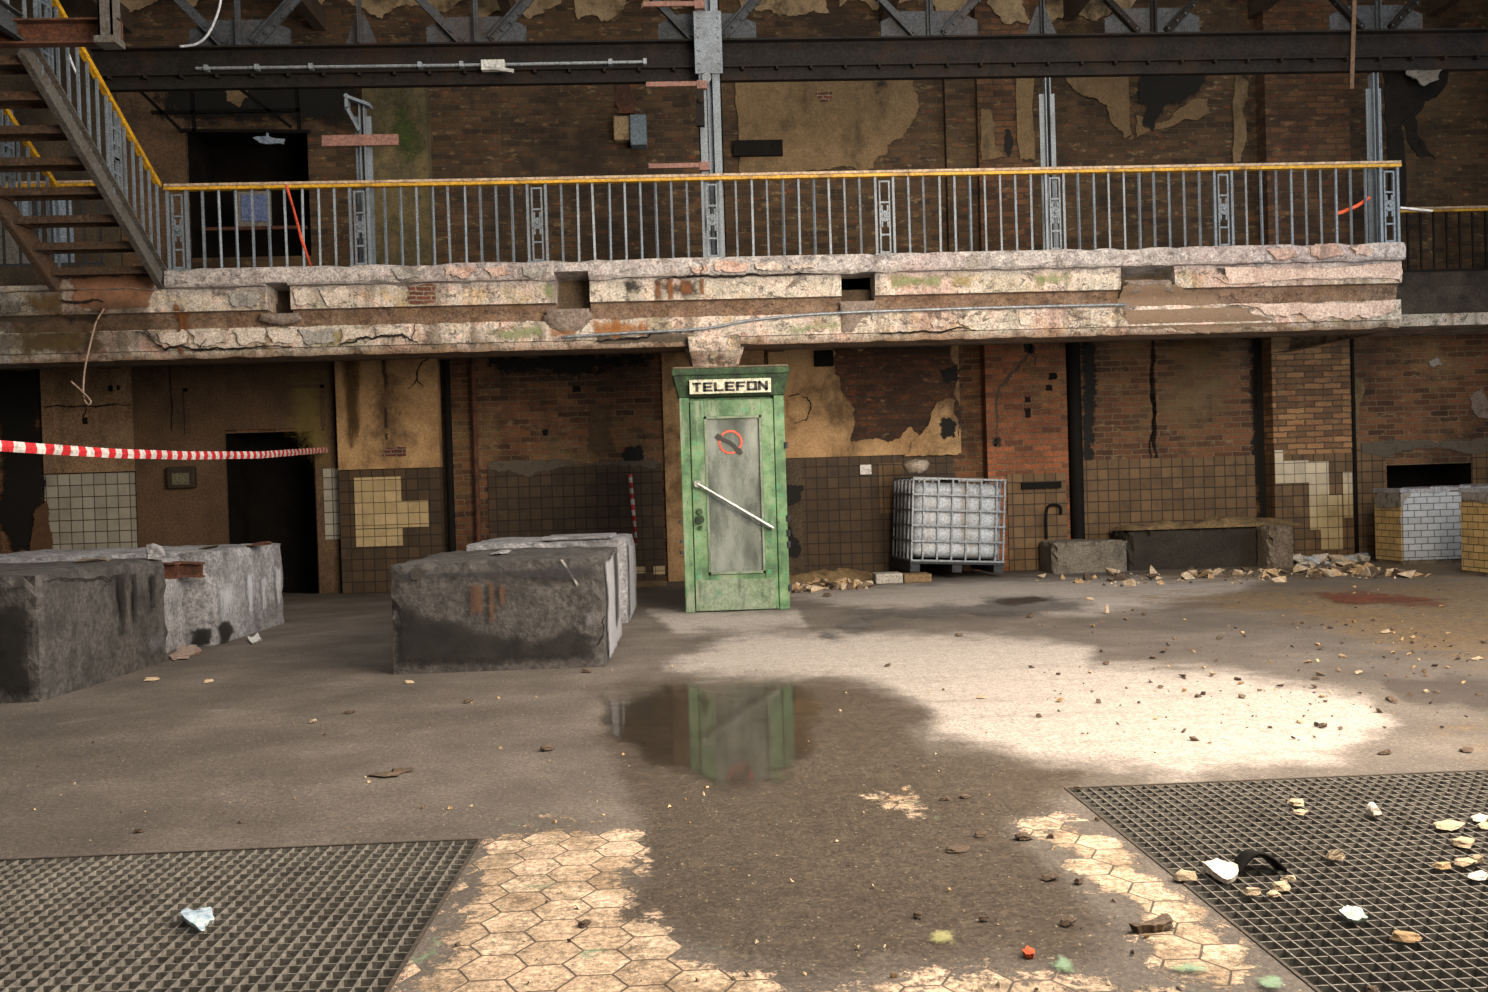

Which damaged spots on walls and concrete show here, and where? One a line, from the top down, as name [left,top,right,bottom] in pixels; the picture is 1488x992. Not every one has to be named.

spalling [0,313,52,324]
peeling [157,326,409,347]
peeling [1117,243,1403,334]
flaking render [833,345,962,442]
crack [1148,340,1158,458]
peeling [0,369,53,552]